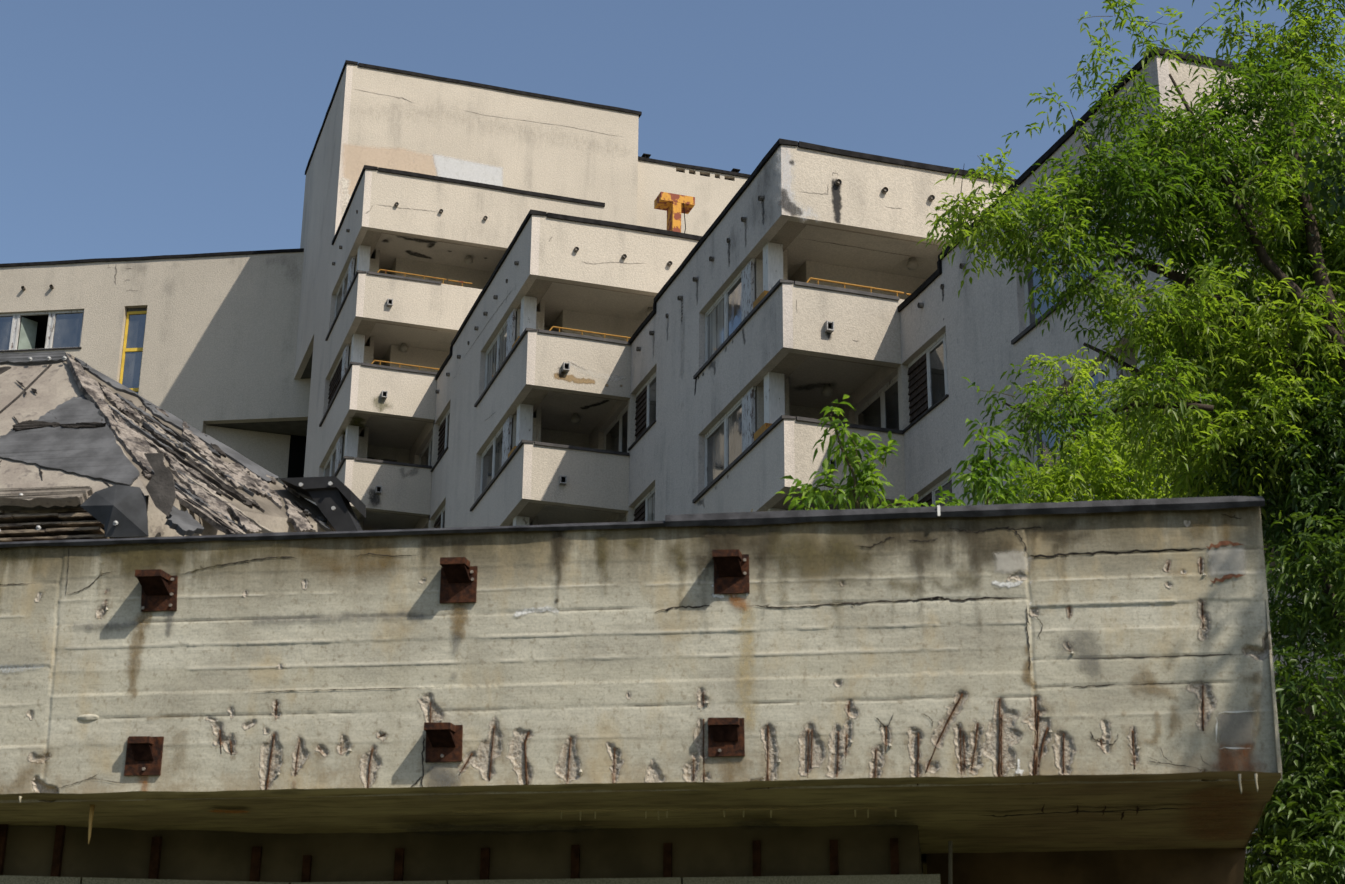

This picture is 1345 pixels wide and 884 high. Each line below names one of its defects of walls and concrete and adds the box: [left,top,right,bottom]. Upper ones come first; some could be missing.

leakage [832,179,842,223]
peeling [64,353,316,536]
crack [185,556,296,574]
leakage [553,531,566,569]
crack [855,527,1206,558]
crack [656,604,709,612]
crack [745,596,1043,671]
crack [1072,654,1232,688]
spalling [205,700,388,790]
spalling [458,717,533,785]
spalling [798,700,859,778]
spalling [869,690,1077,785]